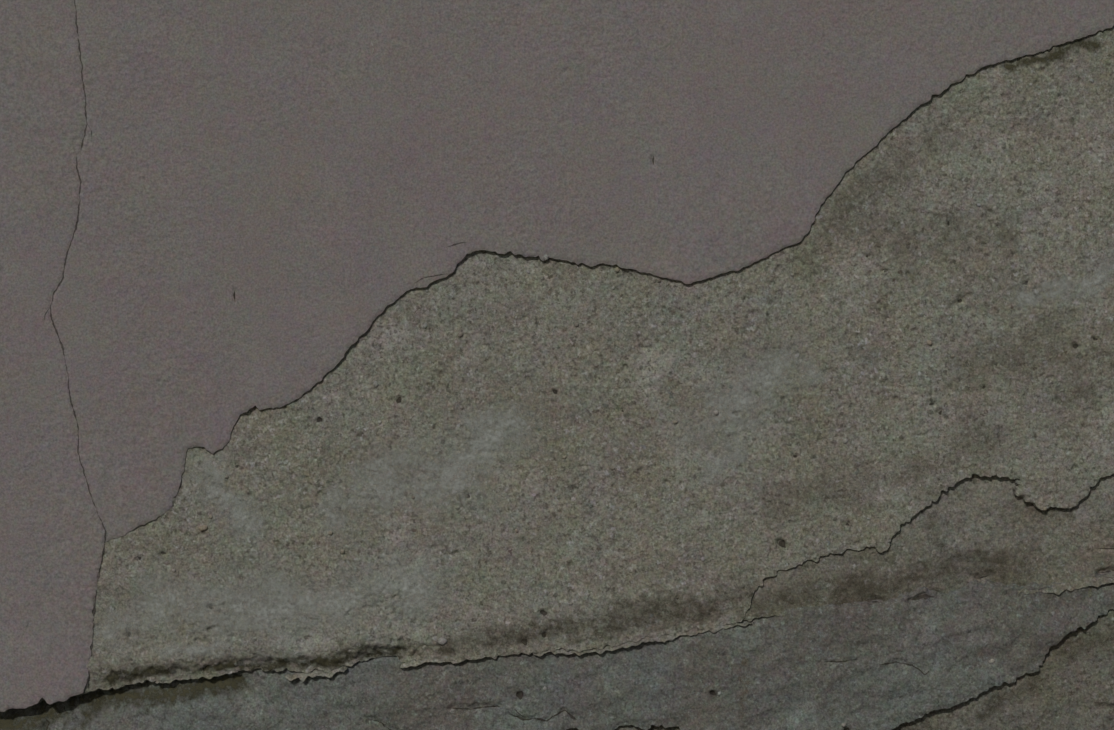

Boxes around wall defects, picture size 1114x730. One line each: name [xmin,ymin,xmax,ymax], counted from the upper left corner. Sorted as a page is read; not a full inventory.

crack [44,0,106,688]
spalling [743,474,1114,622]
spalling [533,622,752,657]
spalling [155,669,239,684]
spalling [284,666,348,682]
spalling [400,659,446,668]
crack [825,659,929,675]
spalling [892,609,1114,730]